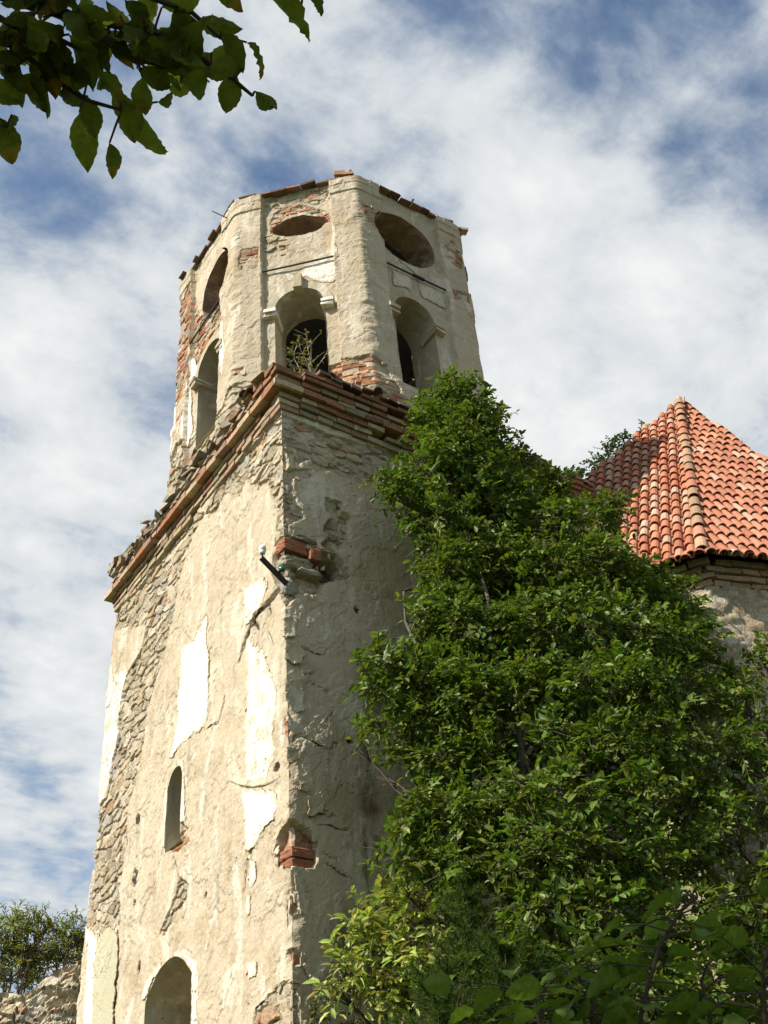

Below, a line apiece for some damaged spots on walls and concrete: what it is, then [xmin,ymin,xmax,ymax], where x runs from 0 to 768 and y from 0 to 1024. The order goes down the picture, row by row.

flaking render [234,187,339,282]
spalling [167,283,255,495]
spalling [329,356,402,402]
spalling [82,415,437,1024]